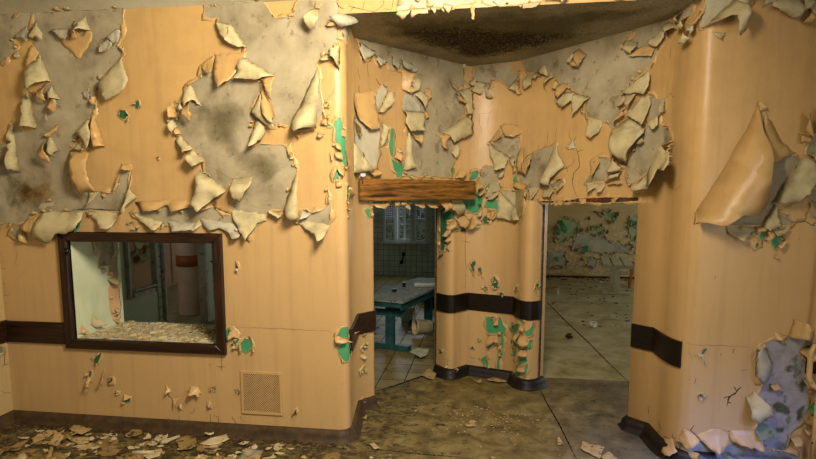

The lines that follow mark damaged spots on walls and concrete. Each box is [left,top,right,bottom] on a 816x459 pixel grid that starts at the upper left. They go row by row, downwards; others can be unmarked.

mould [400,12,625,56]
water stain [213,110,233,139]
peeling [0,0,816,270]
peeling [468,259,519,298]
peeling [226,326,256,354]
peeling [333,326,369,376]
peeling [470,314,536,383]
peeling [85,351,132,405]
peeling [661,319,816,459]